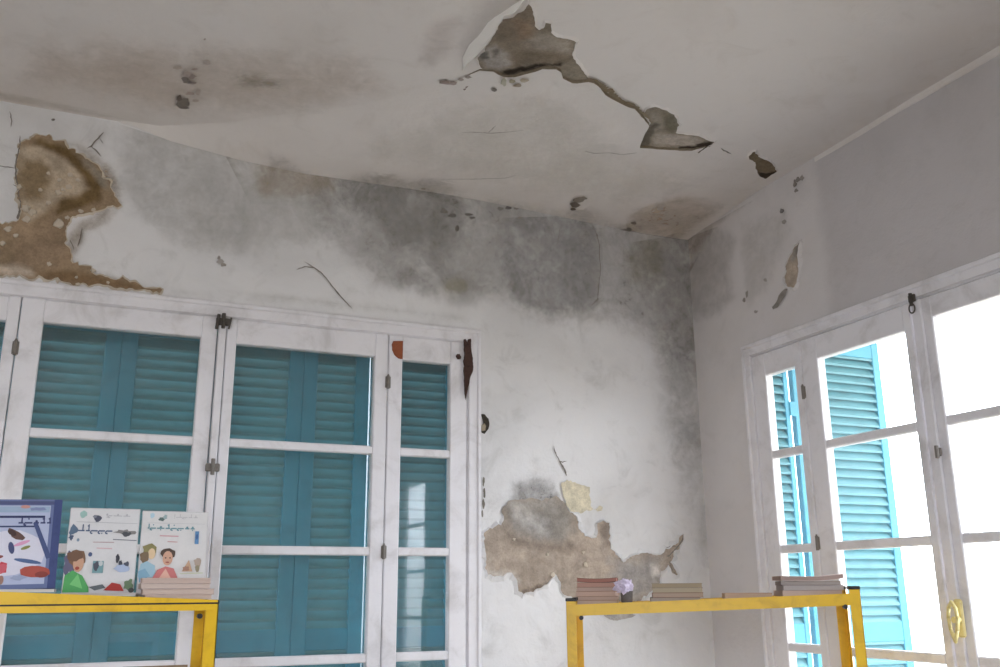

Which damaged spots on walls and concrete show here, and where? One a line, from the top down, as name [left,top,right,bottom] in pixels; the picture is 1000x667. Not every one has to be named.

flaking render [439,0,589,92]
flaking render [640,104,716,154]
flaking render [747,149,778,179]
flaking render [0,133,164,295]
crack [297,262,351,307]
flaking render [772,239,803,309]
corrosion [392,341,403,359]
flaking render [481,414,489,434]
flaking render [481,480,685,601]